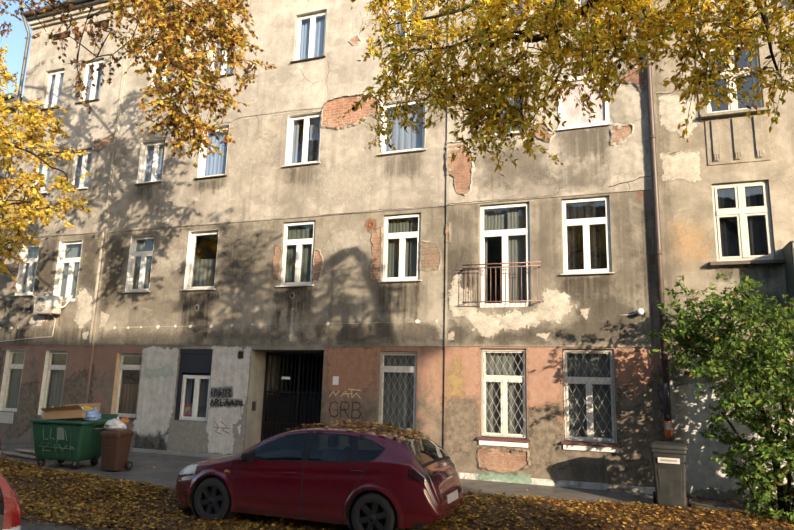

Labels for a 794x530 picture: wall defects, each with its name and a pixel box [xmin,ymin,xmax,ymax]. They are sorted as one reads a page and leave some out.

crack [208,65,336,126]
flaking render [320,93,382,131]
flaking render [658,94,700,140]
flaking render [445,140,475,196]
crack [608,174,651,187]
flaking render [660,150,702,183]
flaking render [312,225,383,284]
damp [182,291,214,332]
damp [277,288,307,342]
damp [379,284,419,315]
peeling [132,346,179,449]
flaking render [442,347,574,475]